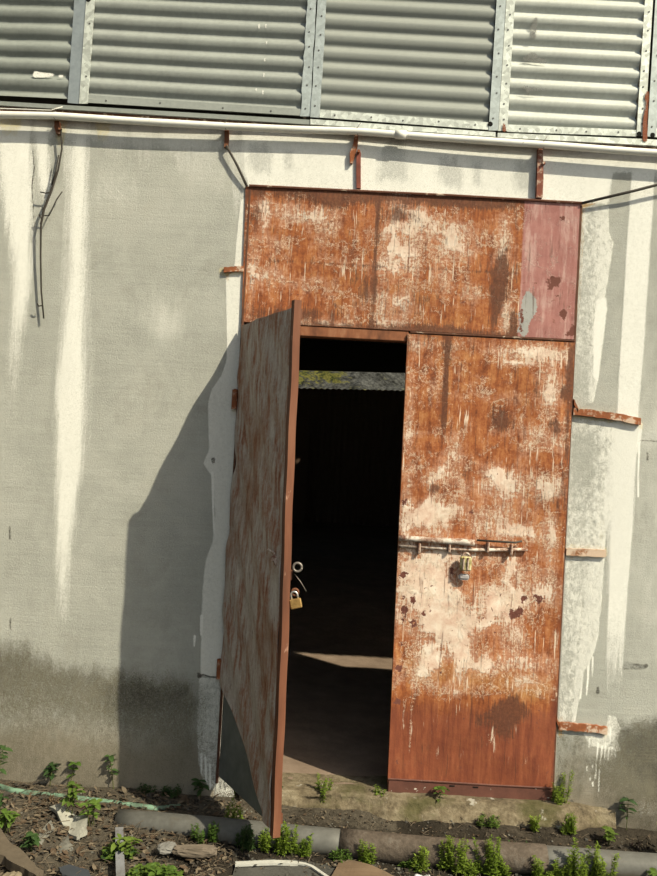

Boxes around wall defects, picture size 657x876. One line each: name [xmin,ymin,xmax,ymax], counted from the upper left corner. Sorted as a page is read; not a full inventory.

water stain [226,130,246,217]
water stain [0,119,215,628]
water stain [0,633,212,795]
water stain [555,713,657,831]